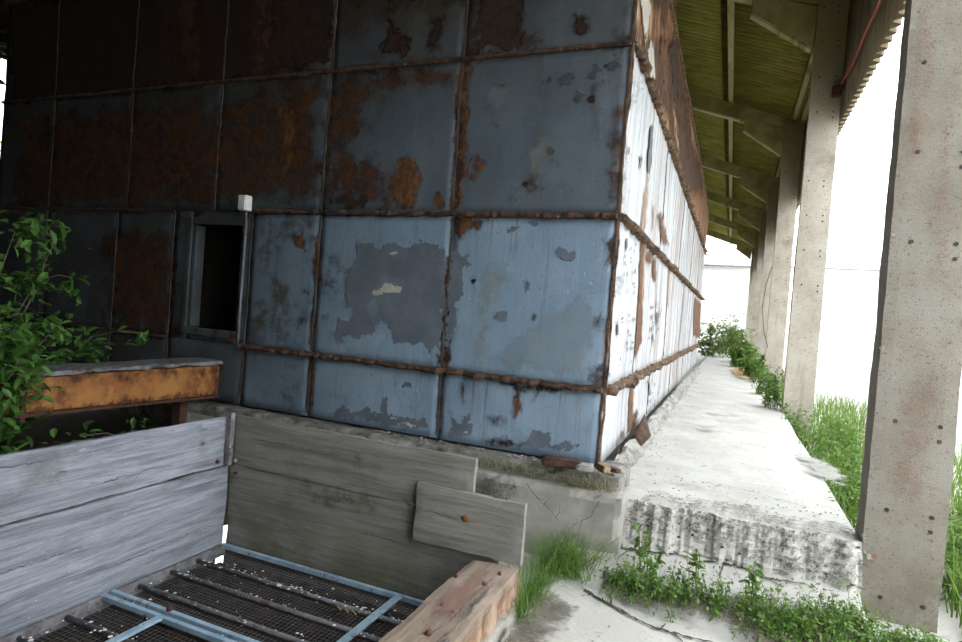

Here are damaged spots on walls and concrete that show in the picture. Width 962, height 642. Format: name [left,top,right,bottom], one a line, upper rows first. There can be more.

rust [573,14,590,36]
rust [318,0,543,237]
rust [617,0,704,197]
rust [641,190,669,246]
rust [292,232,332,343]
peeling [334,240,476,356]
rust [635,241,670,361]
rust [75,365,220,409]
peeling [526,429,580,451]
rust [589,365,610,386]